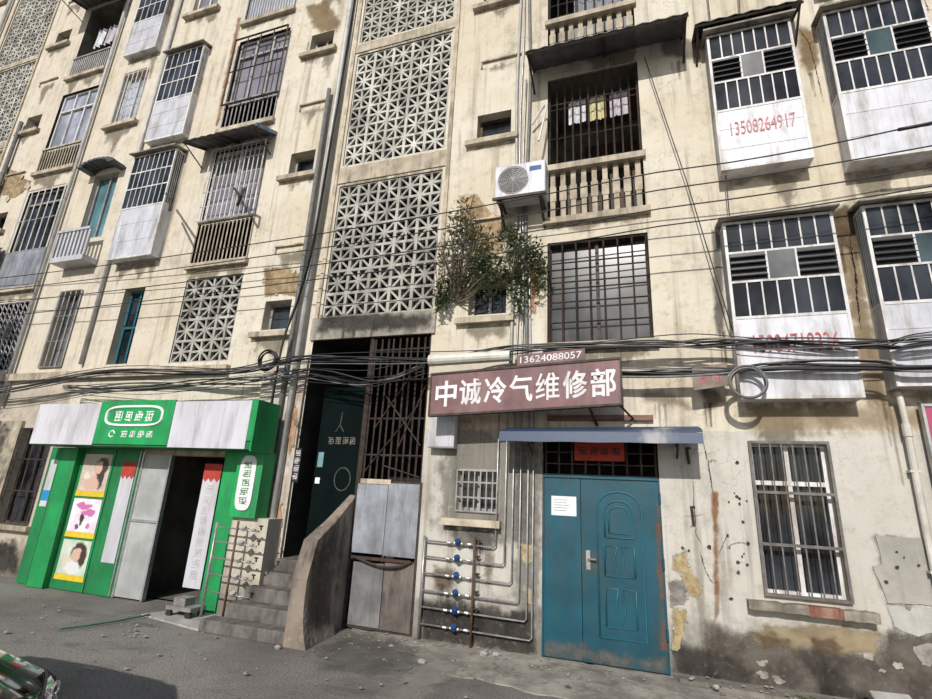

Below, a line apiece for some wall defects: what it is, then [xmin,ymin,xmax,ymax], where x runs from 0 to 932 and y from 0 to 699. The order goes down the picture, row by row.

crack [849,232,862,328]
peeling [668,546,703,651]
damp [674,624,932,699]
flaking render [913,643,932,667]